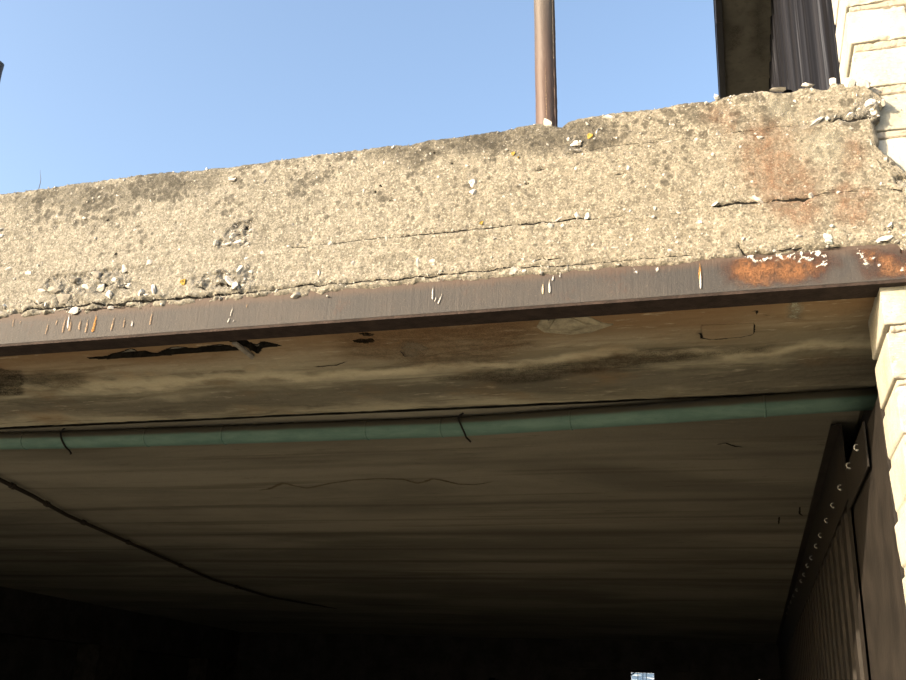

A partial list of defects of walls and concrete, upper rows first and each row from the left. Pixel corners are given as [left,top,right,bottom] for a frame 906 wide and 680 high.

spalling [0,175,161,245]
crack [291,216,618,248]
spalling [541,203,590,249]
crack [690,179,903,212]
spalling [848,214,906,251]
spalling [404,235,568,281]
rust [731,255,827,281]